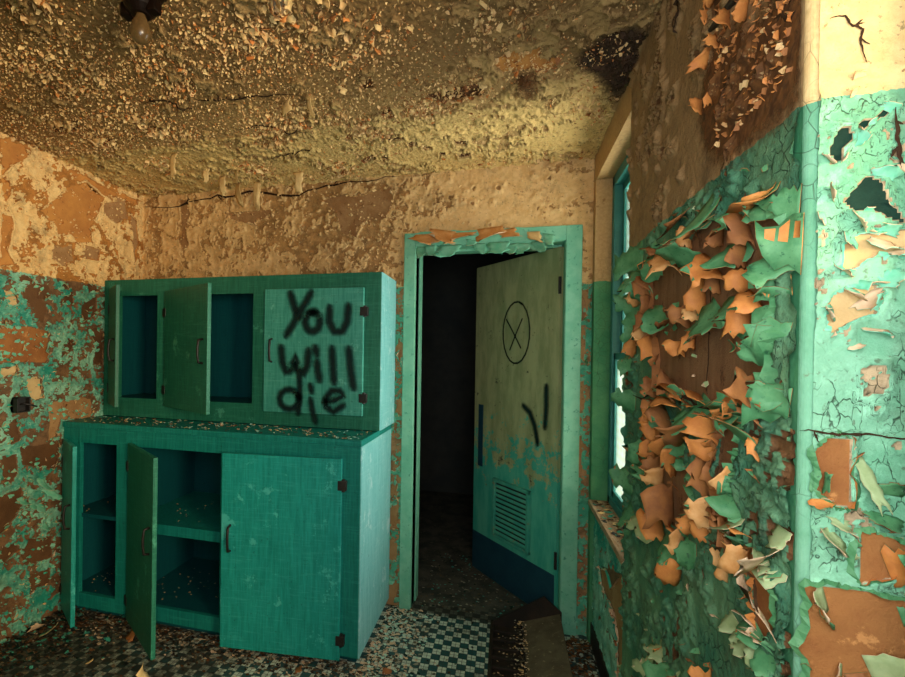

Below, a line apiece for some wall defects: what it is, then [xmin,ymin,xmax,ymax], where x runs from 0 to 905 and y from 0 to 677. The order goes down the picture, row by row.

spalling [686,0,794,149]
crack [831,15,870,63]
spalling [822,101,903,164]
peeling [0,0,650,636]
peeling [597,163,905,677]